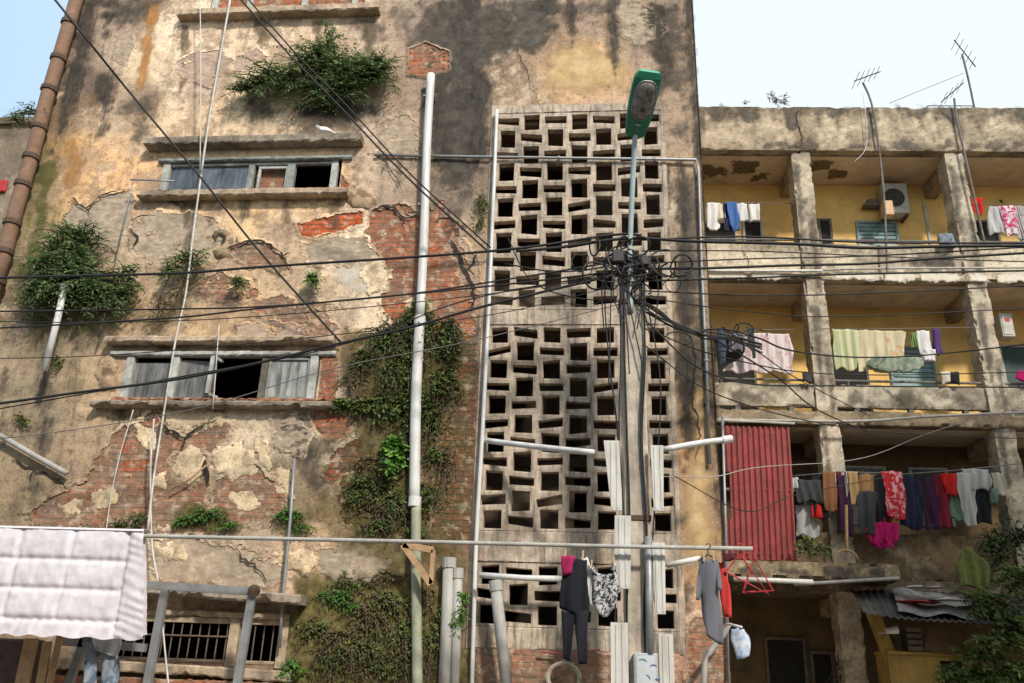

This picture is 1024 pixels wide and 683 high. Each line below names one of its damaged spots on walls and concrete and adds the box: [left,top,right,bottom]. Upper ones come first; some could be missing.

spalling [404,41,452,80]
damp [408,0,627,195]
damp [640,0,730,161]
damp [743,109,755,122]
damp [783,107,800,130]
damp [850,111,918,150]
damp [897,105,956,124]
peeling [702,160,770,181]
peeling [811,160,848,179]
spalling [17,183,484,593]
crack [237,549,268,586]